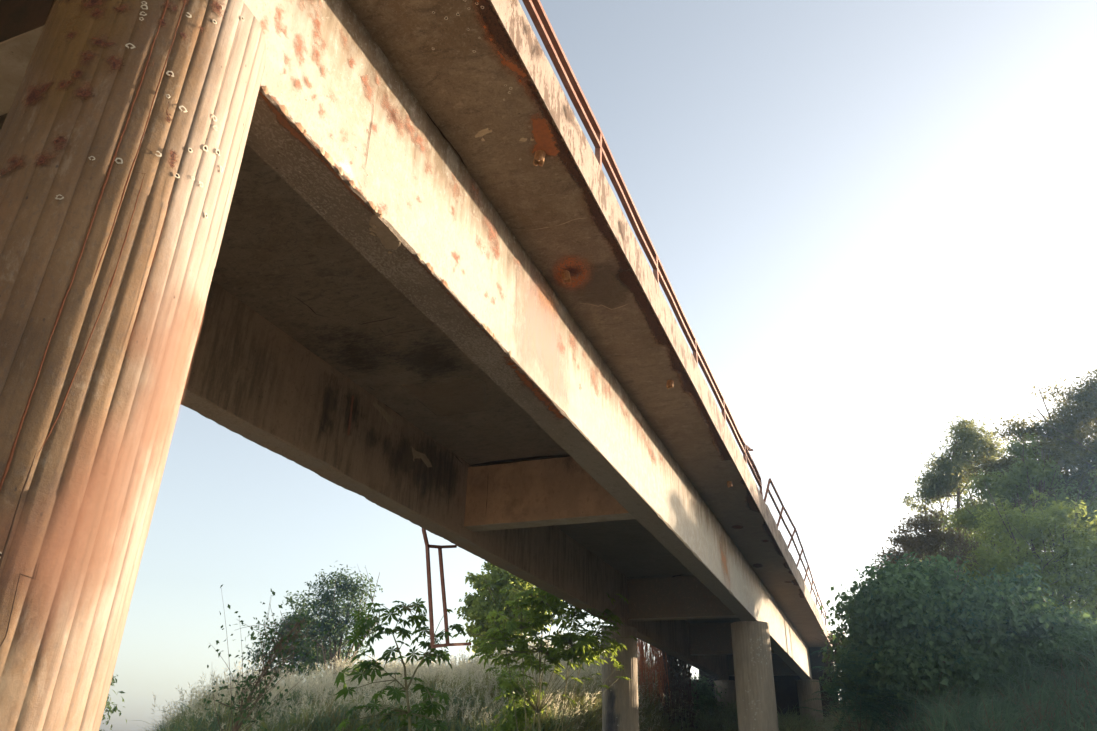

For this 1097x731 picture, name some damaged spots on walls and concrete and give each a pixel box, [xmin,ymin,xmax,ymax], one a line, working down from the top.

spalling [258,84,512,357]
rust [531,114,560,157]
water stain [472,0,731,460]